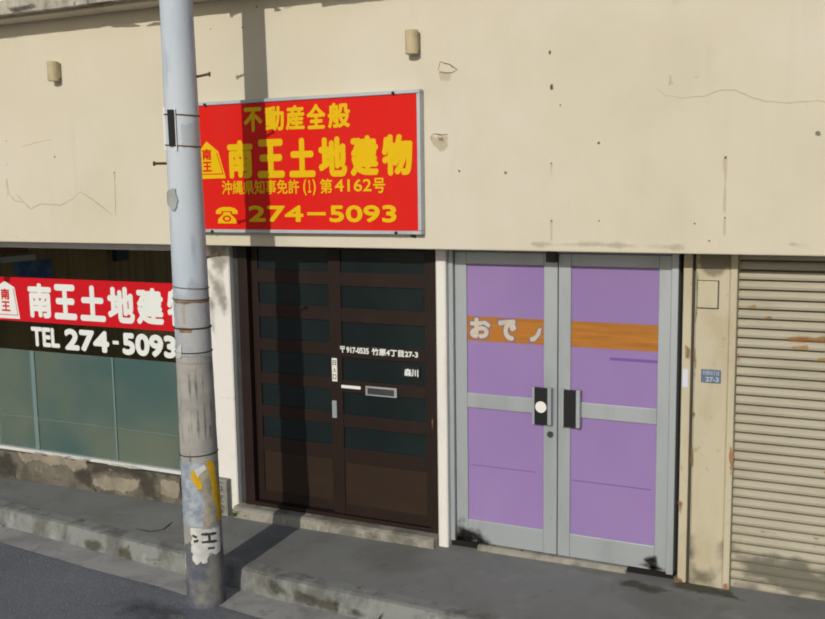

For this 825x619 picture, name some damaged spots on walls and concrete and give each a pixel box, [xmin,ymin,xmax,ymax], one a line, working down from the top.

damp [210,246,227,267]
corrosion [789,337,825,350]
flaking render [18,452,87,472]
flaking render [93,463,140,494]